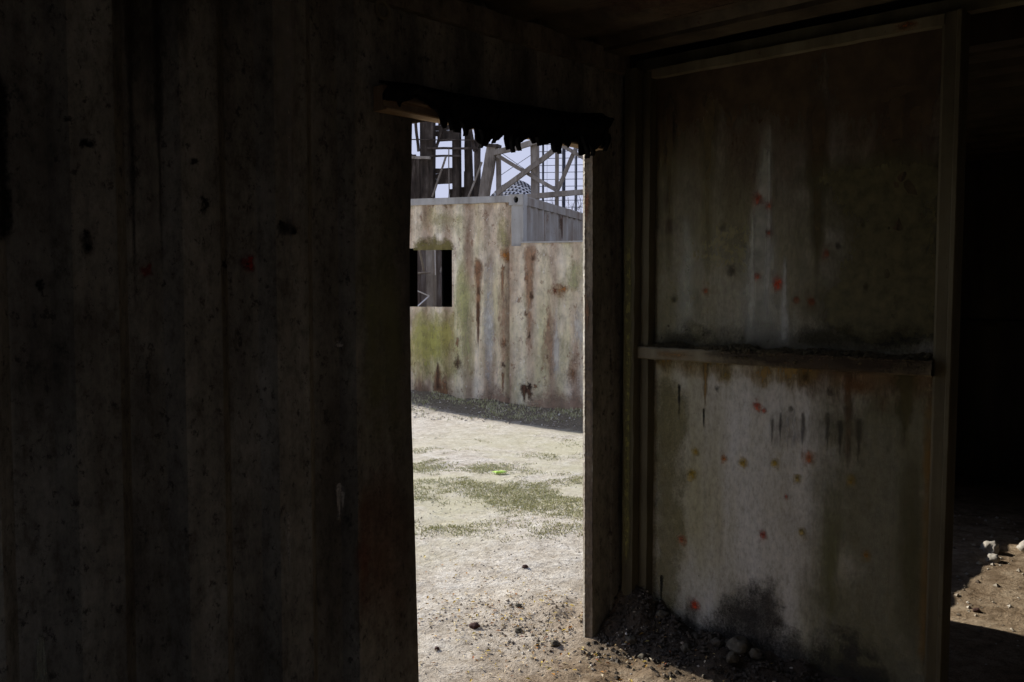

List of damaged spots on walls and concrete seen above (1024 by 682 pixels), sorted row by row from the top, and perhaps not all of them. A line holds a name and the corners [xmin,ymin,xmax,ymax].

leakage [655,28,942,340]
corrosion [474,260,482,339]
corrosion [524,247,536,338]
corrosion [520,383,537,400]
leakage [669,588,886,682]